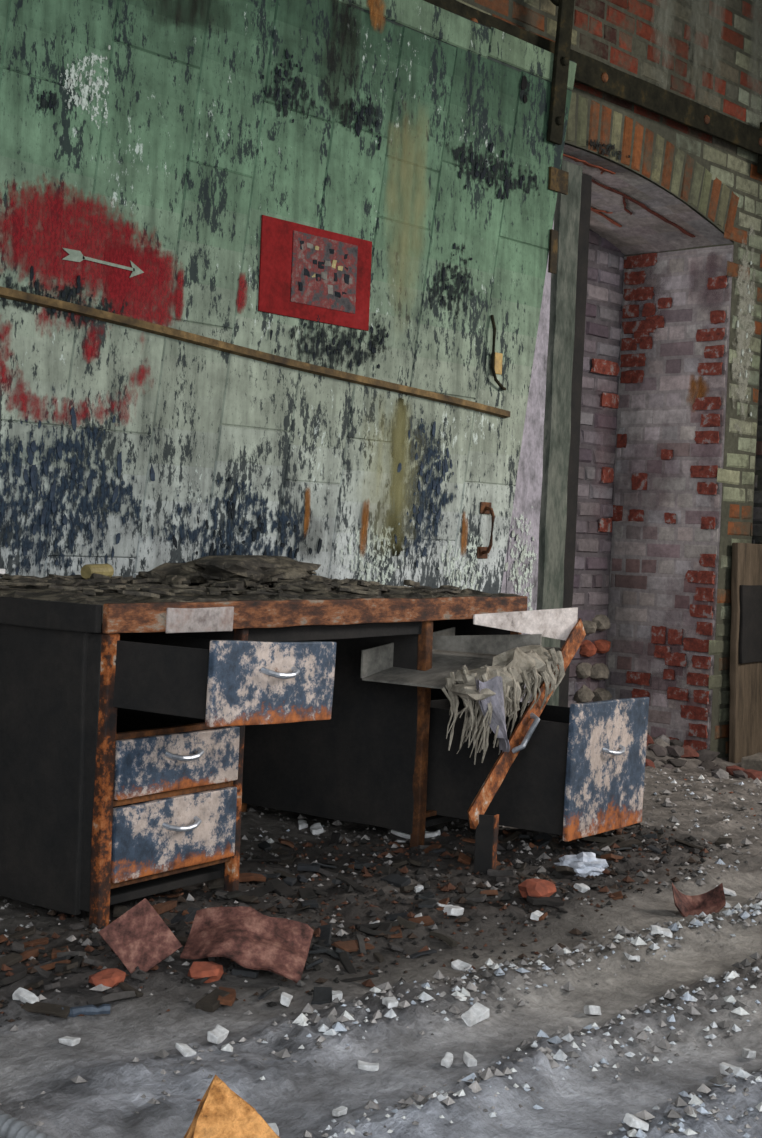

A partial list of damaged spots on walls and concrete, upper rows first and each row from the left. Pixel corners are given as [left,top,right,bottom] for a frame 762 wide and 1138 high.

spalling [591,253,672,409]
spalling [692,228,755,444]
spalling [617,434,627,448]
peeling [0,387,483,590]
spalling [631,473,648,490]
spalling [690,465,718,495]
corrosion [360,502,369,552]
spalling [598,505,644,532]
spalling [664,512,676,524]
spalling [701,516,716,530]
peeling [505,507,537,610]
spalling [626,554,716,751]